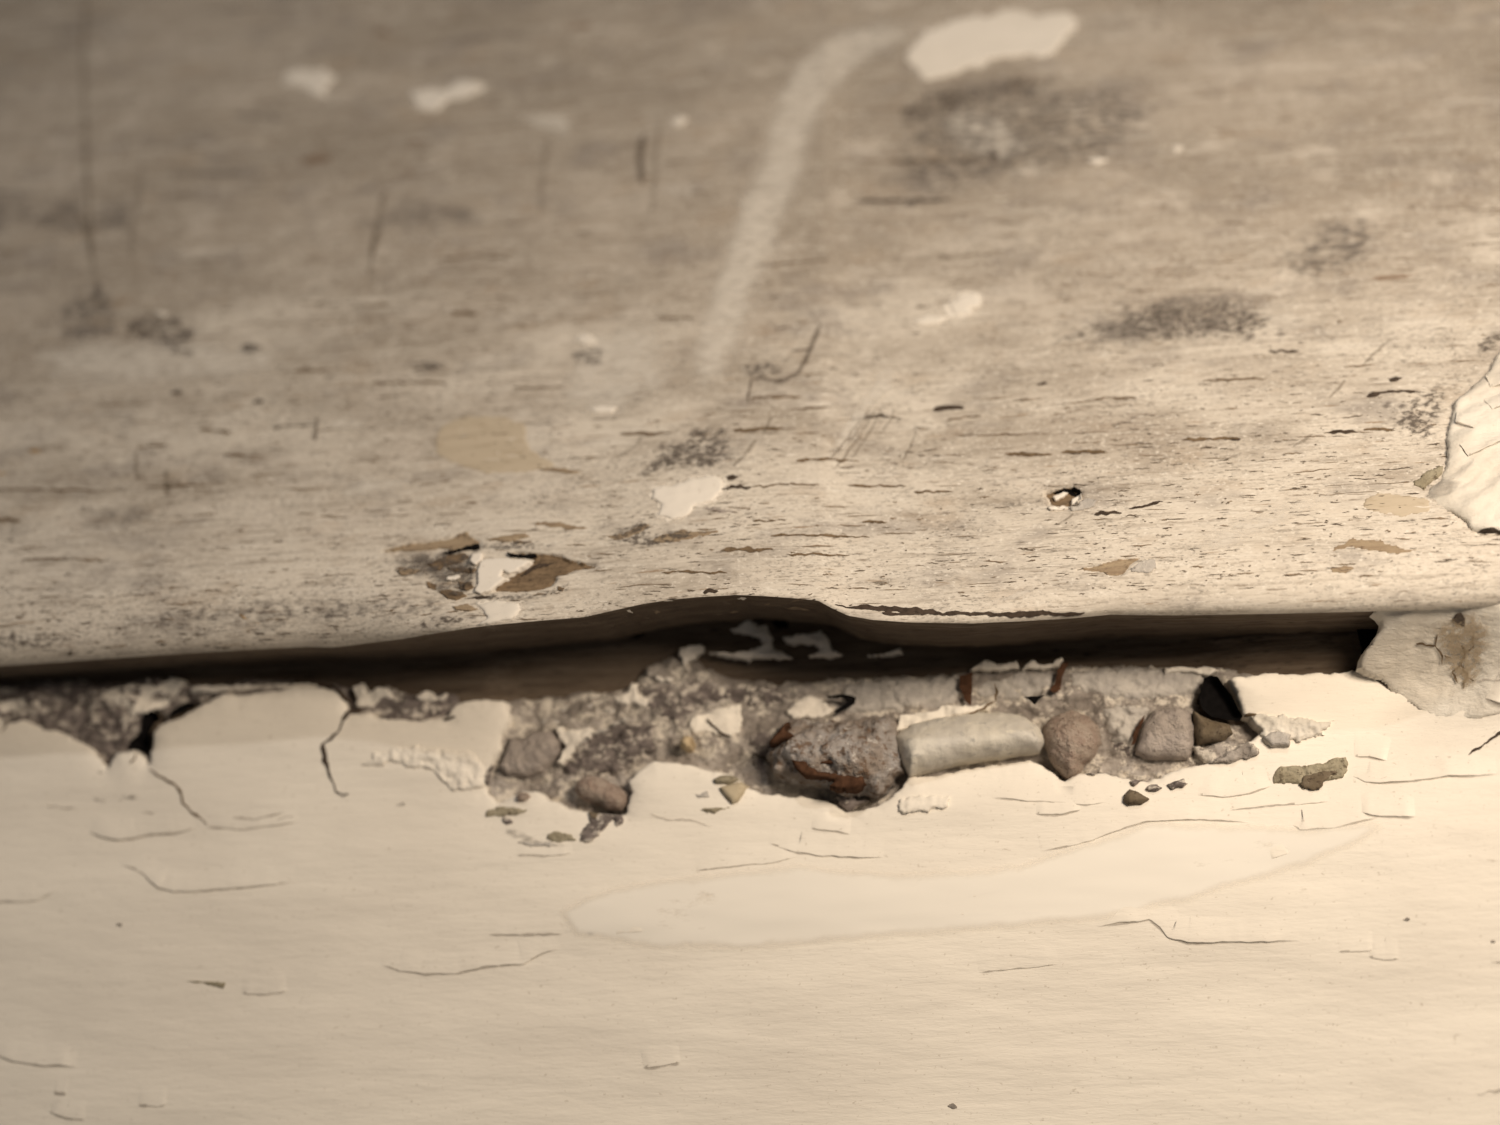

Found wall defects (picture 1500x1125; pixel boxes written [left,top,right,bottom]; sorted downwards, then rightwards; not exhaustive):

peeling [533,521,588,530]
peeling [446,553,533,595]
crack [1416,635,1474,688]
peeling [0,676,461,768]
crack [287,680,391,796]
crack [707,719,769,763]
peeling [361,620,1500,858]
crack [968,685,998,715]
crack [1131,715,1145,746]
crack [1469,731,1500,754]
crack [98,754,207,825]